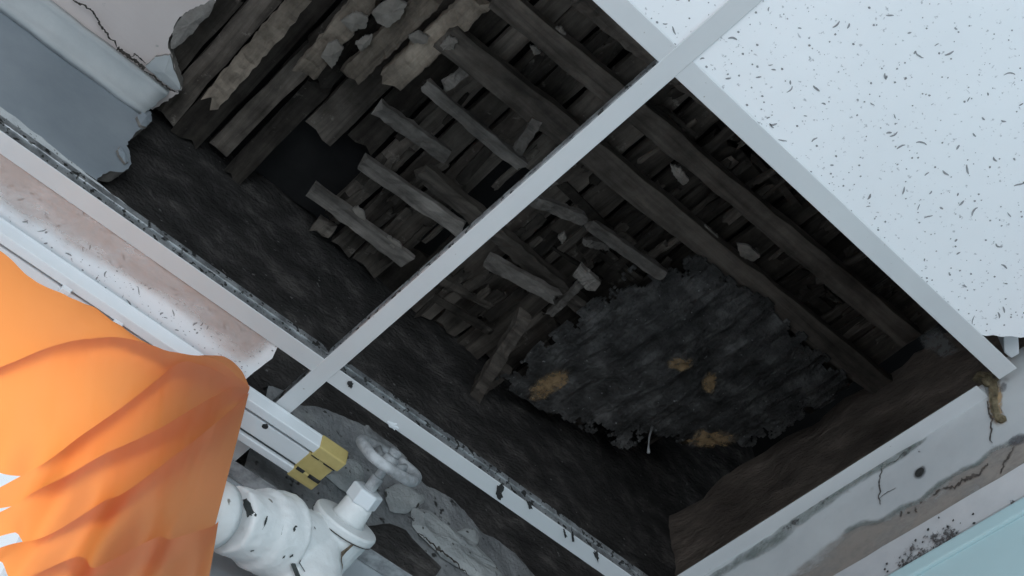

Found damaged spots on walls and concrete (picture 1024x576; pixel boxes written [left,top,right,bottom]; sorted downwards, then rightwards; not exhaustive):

peeling [0,0,216,182]
crack [73,0,178,93]
peeling [321,0,407,68]
peeling [352,205,366,220]
peeling [670,163,689,185]
peeling [737,243,760,261]
spalling [243,405,535,576]
leakage [713,441,922,576]
leakage [797,440,1024,576]
crack [878,401,1014,517]